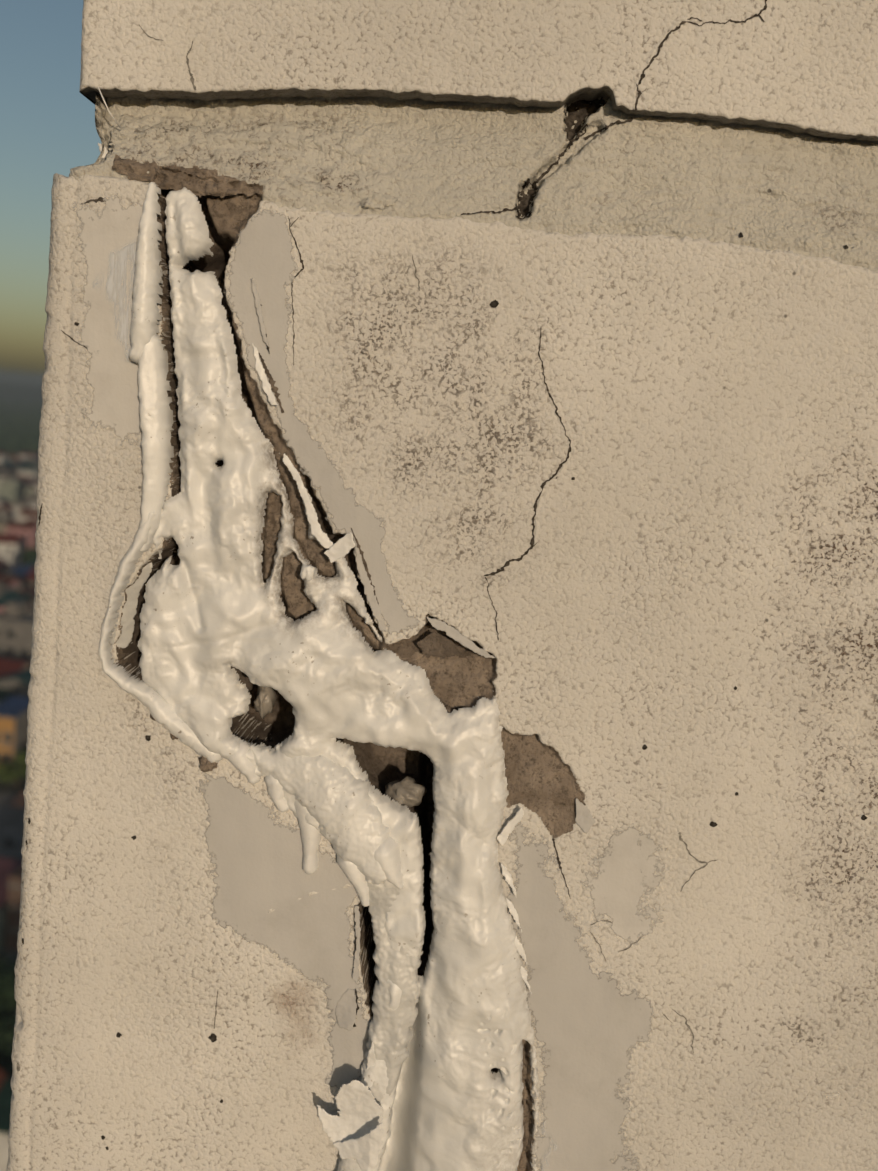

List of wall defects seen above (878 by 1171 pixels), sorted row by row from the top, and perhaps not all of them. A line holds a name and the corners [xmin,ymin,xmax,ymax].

crack [630,0,771,110]
spalling [112,155,264,198]
crack [153,166,387,652]
crack [484,332,571,640]
crack [114,538,180,680]
crack [230,666,295,749]
spalling [383,614,498,713]
spalling [497,727,596,846]
crack [336,738,435,976]
crack [268,884,378,1030]
peeling [317,1041,383,1143]
crack [491,1039,535,1171]